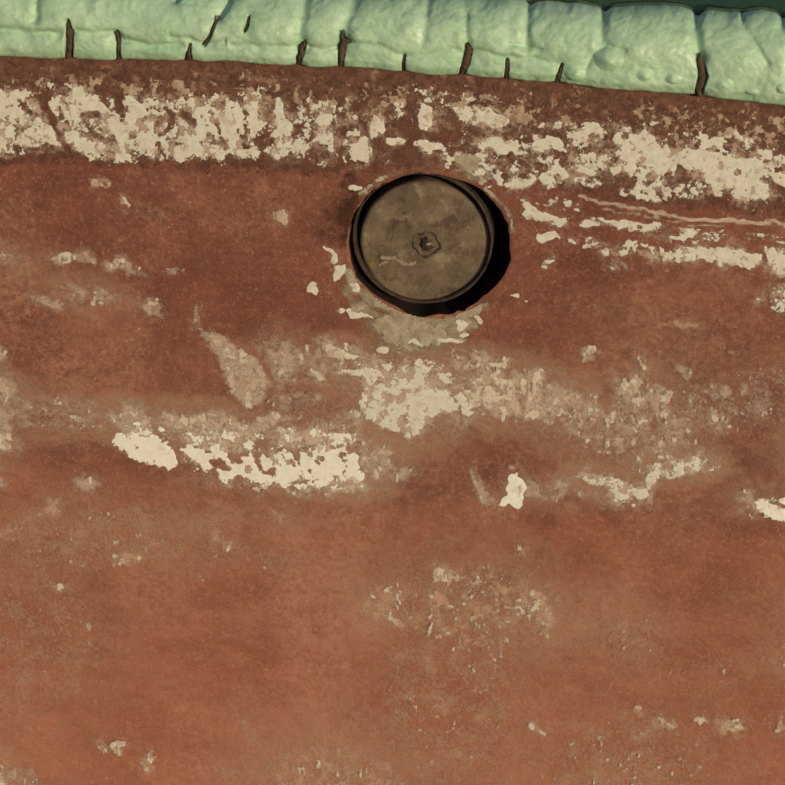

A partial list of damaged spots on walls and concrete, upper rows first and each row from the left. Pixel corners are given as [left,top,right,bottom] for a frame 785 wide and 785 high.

crack [65,21,74,59]
crack [114,31,122,59]
crack [185,15,220,61]
crack [296,41,306,64]
crack [338,30,350,66]
crack [459,43,473,75]
crack [695,54,707,97]
peeling [0,56,785,313]
spalling [323,246,489,354]
peeling [112,422,365,491]
peeling [499,473,527,509]
peeling [754,497,785,522]